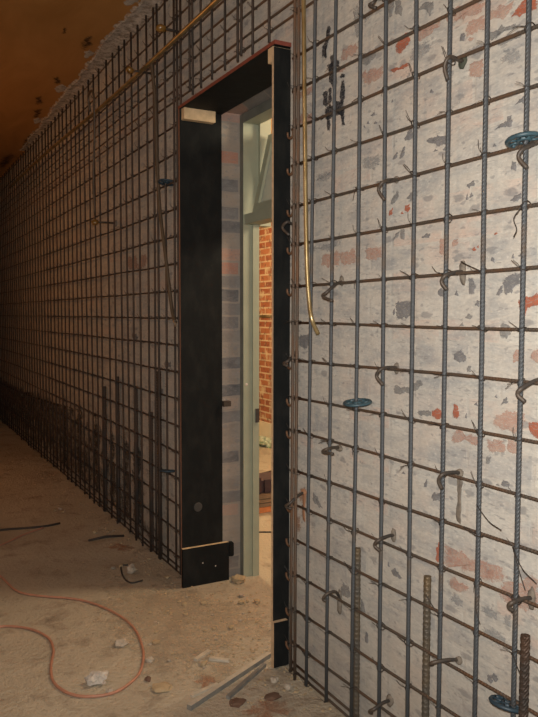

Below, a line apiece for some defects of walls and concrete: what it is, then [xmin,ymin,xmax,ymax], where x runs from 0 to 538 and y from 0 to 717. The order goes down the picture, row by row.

flaking render [512,0,526,17]
flaking render [490,24,516,40]
leakage [320,26,345,131]
flaking render [525,293,538,311]
flaking render [529,422,538,439]